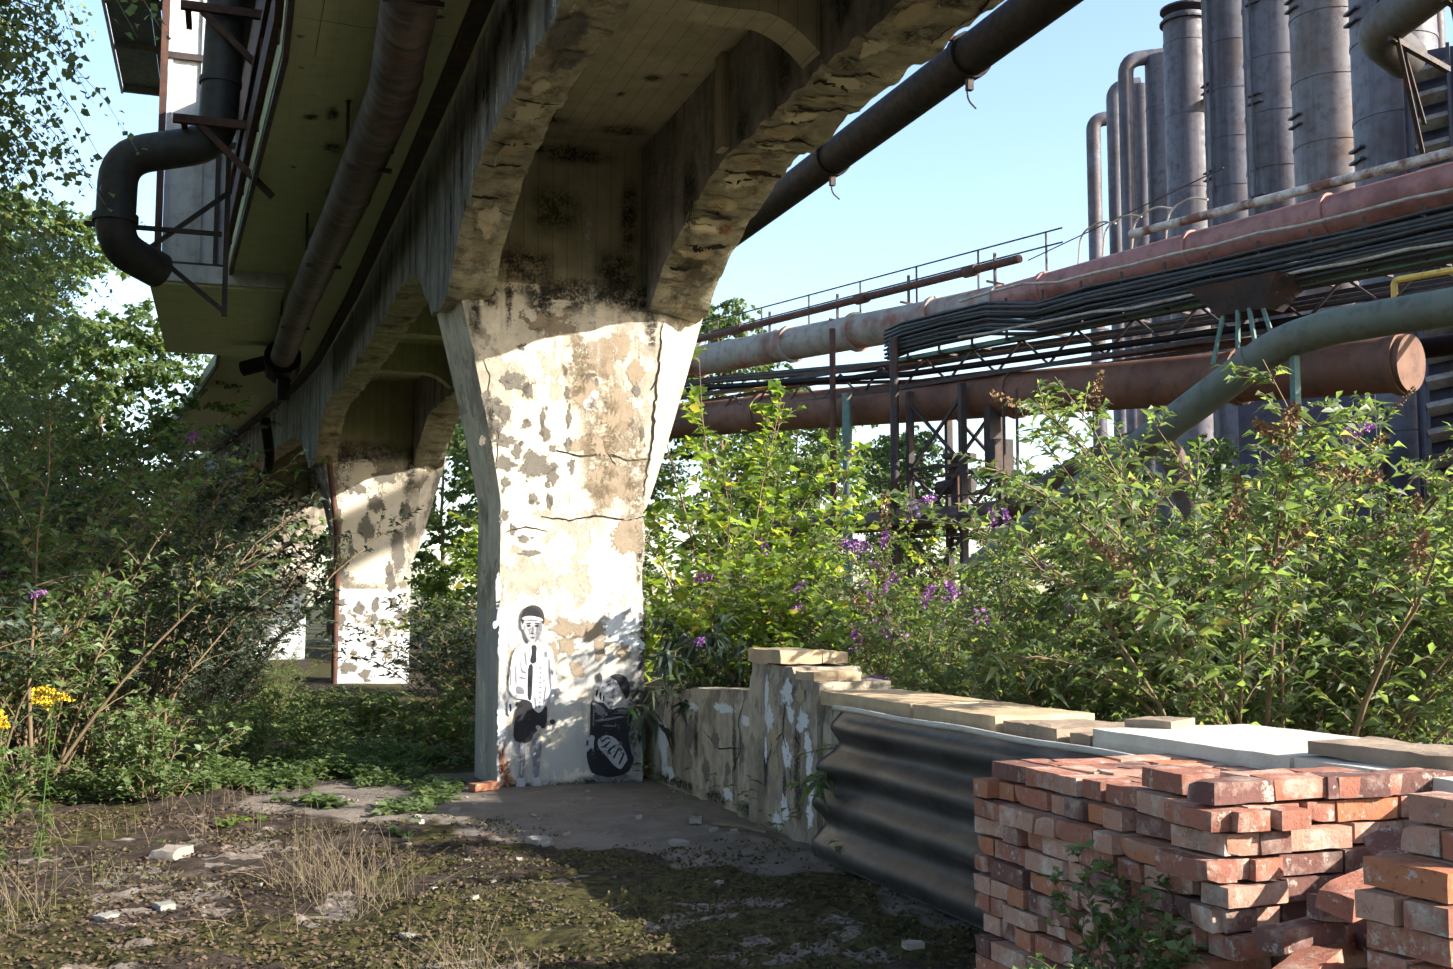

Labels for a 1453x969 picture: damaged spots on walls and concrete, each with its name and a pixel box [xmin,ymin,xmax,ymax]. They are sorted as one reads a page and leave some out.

spalling [857,0,940,60]
spalling [675,73,871,261]
peeling [513,310,578,351]
peeling [479,329,647,557]
water stain [470,188,658,516]
crack [506,321,664,533]
peeling [325,468,412,683]